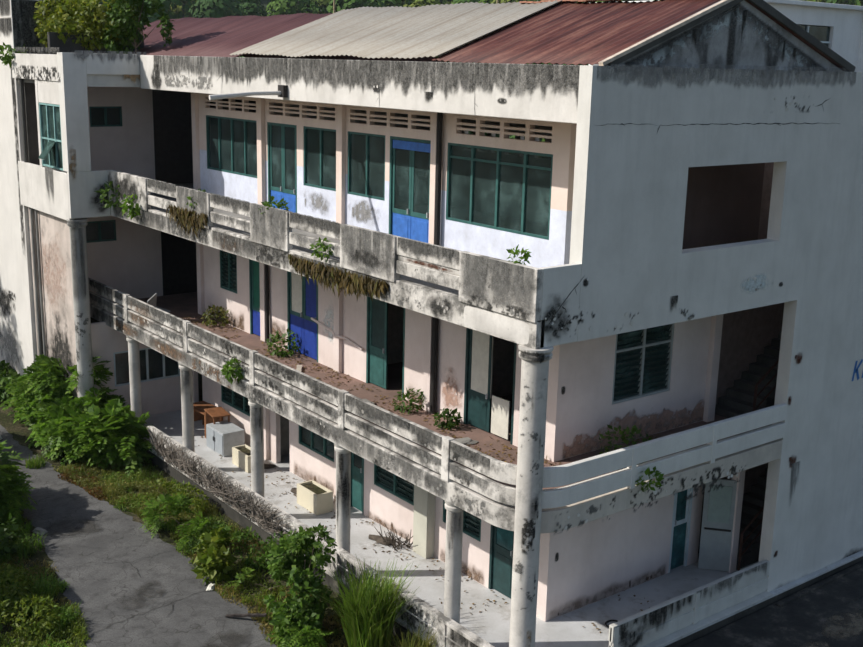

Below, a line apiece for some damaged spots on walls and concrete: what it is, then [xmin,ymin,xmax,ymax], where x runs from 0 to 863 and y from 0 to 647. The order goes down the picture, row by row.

damp [74,50,580,106]
crack [597,99,838,132]
damp [92,178,534,313]
damp [0,289,14,316]
spalling [543,303,595,338]
damp [37,315,77,391]
damp [68,221,490,513]
peeling [563,402,704,458]
spalling [515,498,538,574]
spalling [555,498,615,533]
spalling [630,466,743,511]
damp [619,562,767,647]